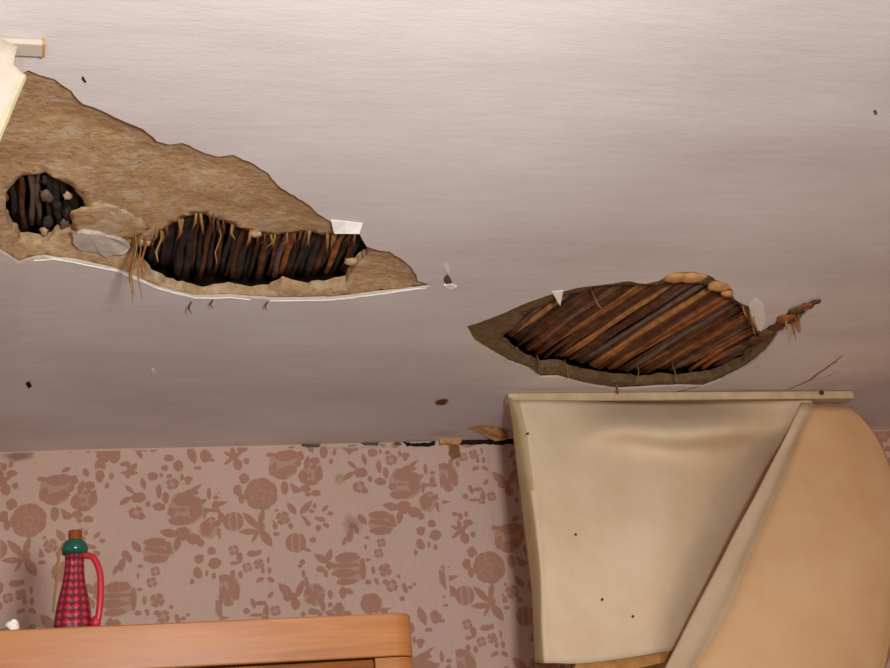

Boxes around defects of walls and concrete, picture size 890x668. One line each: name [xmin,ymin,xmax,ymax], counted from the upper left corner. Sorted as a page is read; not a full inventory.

spalling [0,70,428,313]
spalling [468,272,821,394]
crack [301,425,514,449]